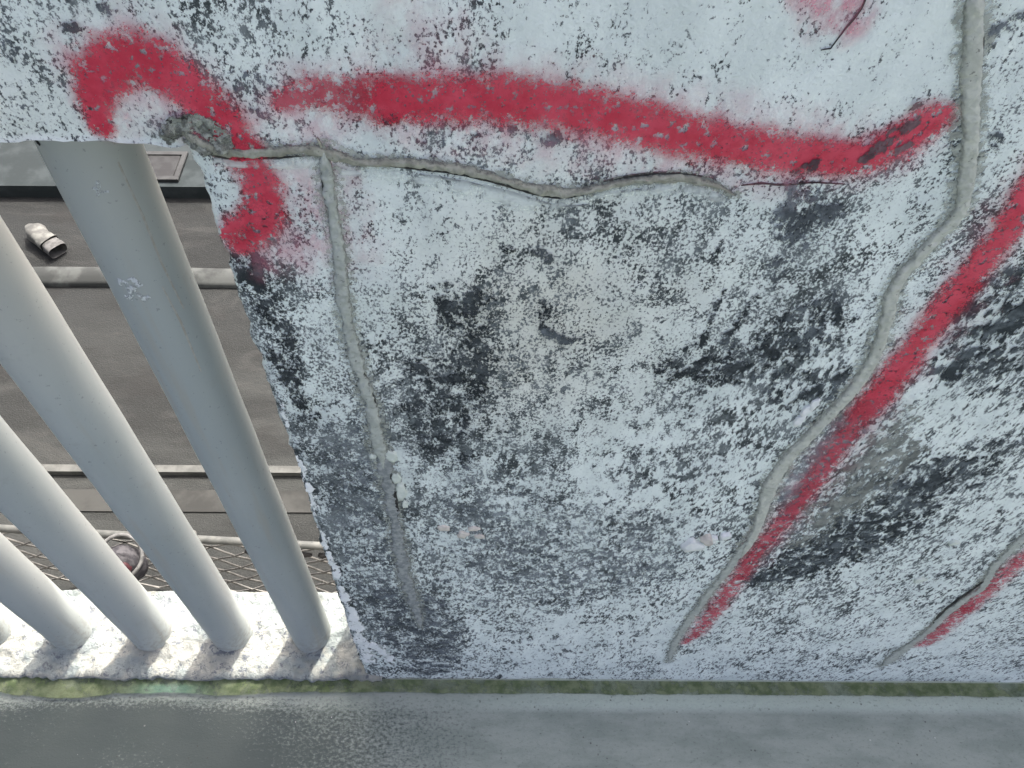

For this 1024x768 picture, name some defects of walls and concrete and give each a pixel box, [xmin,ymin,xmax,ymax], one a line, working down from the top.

crack [180,127,845,629]
crack [664,0,998,663]
crack [874,531,1024,669]